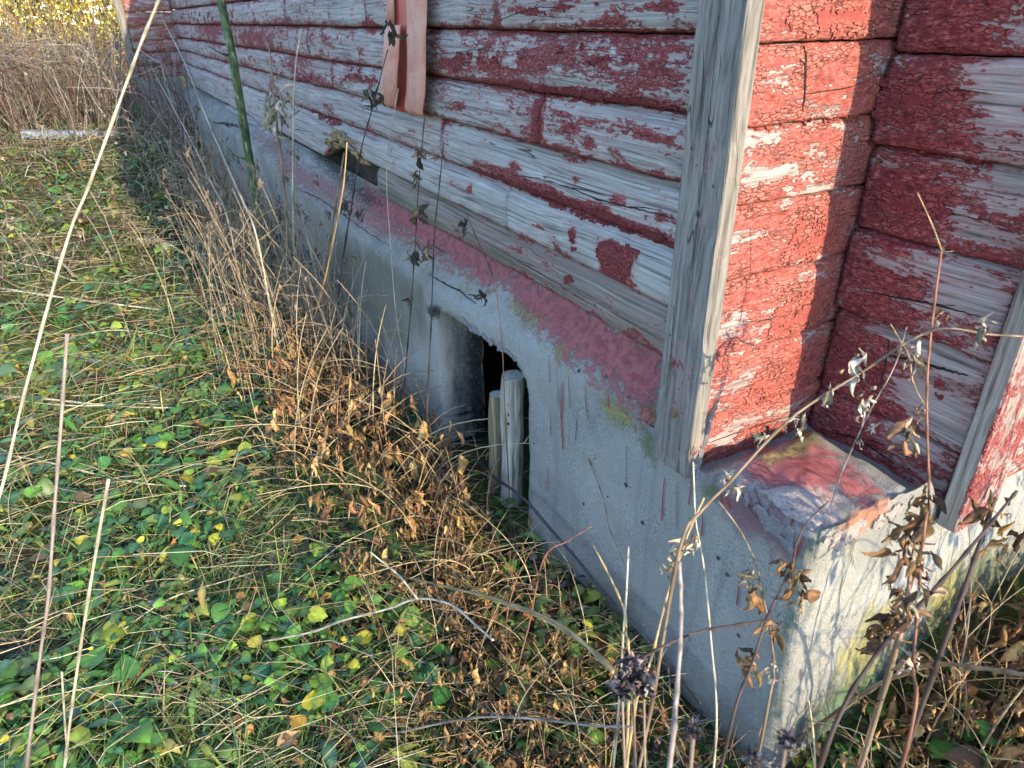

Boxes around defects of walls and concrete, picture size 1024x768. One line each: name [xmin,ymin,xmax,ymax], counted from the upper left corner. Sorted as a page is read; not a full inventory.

peeling [785,7,883,39]
crack [800,45,870,109]
peeling [508,80,679,141]
crack [516,18,719,275]
peeling [800,116,855,126]
peeling [467,165,674,284]
peeling [780,208,846,265]
peeling [862,182,954,227]
peeling [766,285,827,340]
peeling [828,334,883,386]
peeling [724,418,800,458]
spalling [822,502,920,552]